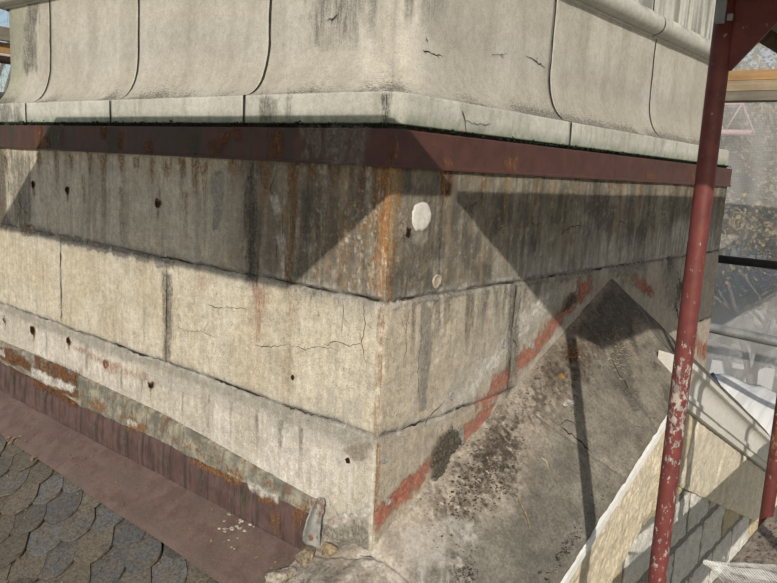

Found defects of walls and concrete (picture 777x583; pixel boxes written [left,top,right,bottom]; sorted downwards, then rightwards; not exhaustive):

water stain [243,162,265,304]
corrosion [349,166,403,303]
corrosion [0,347,78,407]
crack [43,177,651,434]
water stain [439,290,550,413]
crack [535,413,611,470]